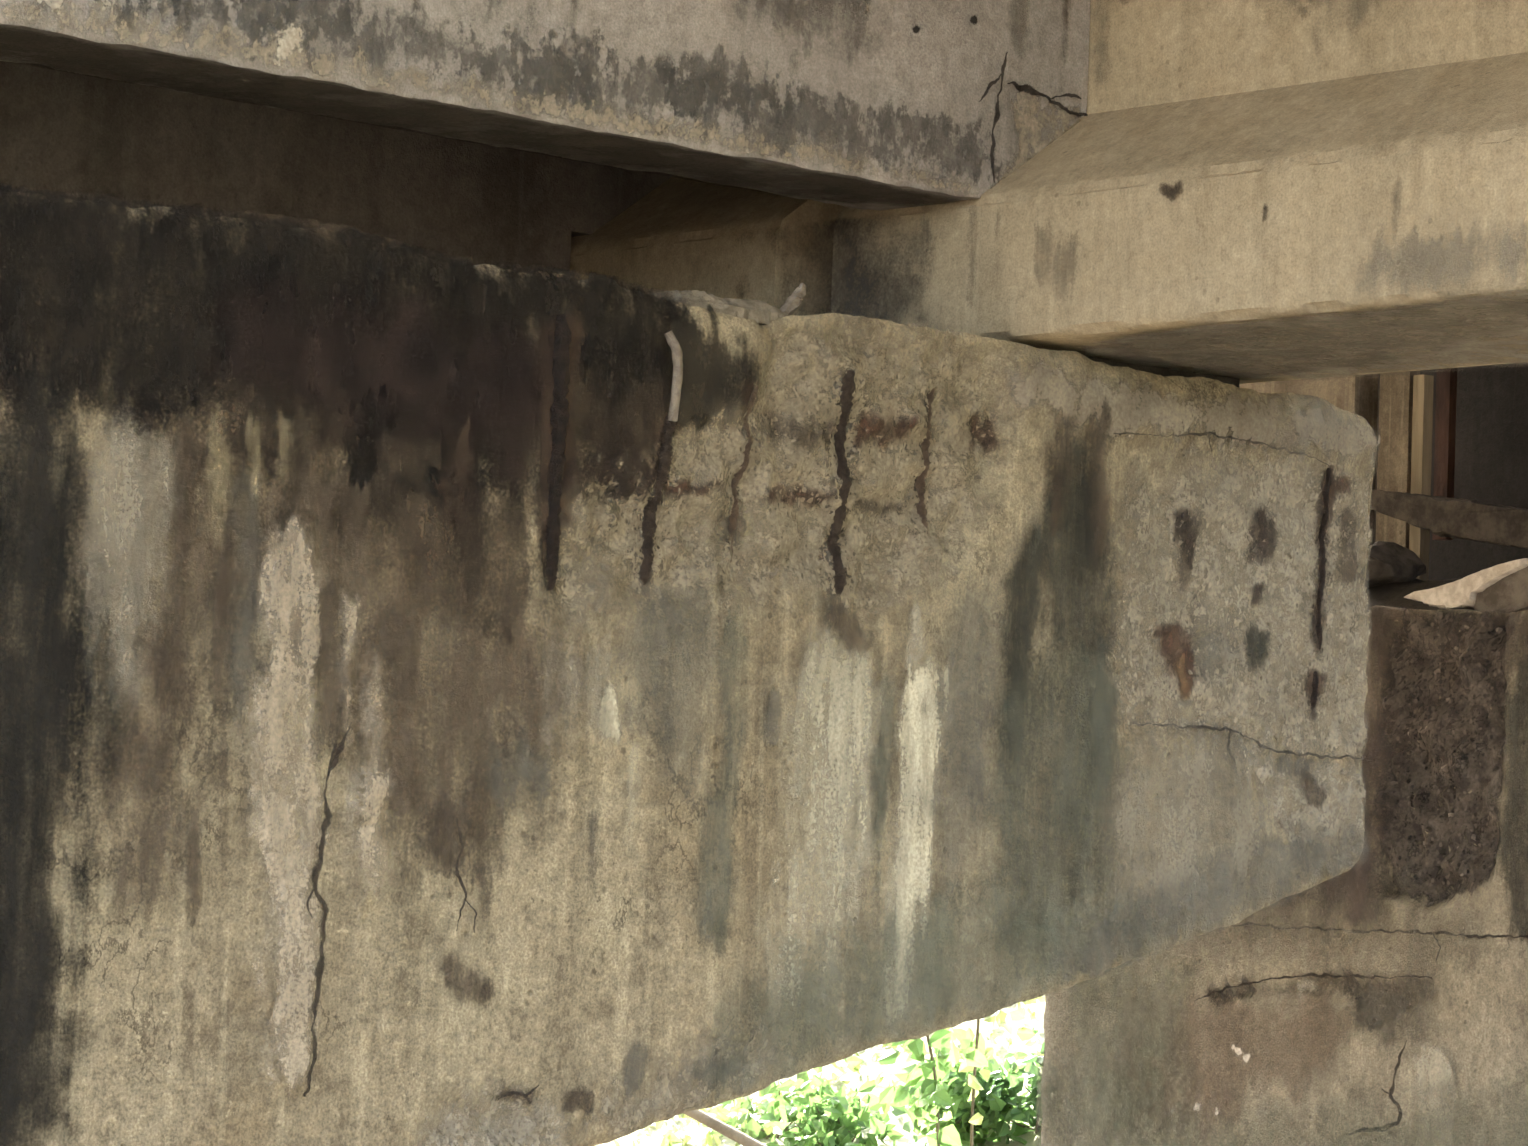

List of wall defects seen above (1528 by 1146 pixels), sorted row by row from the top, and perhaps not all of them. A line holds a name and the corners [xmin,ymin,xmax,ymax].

water stain [0,0,1002,326]
crack [979,52,1088,183]
water stain [1079,290,1528,380]
water stain [0,183,759,1146]
rust [1153,622,1195,698]
water stain [764,399,1528,1146]
crack [1133,723,1373,766]
crack [303,723,352,1097]
crack [1231,923,1528,962]
crack [1350,1040,1407,1135]